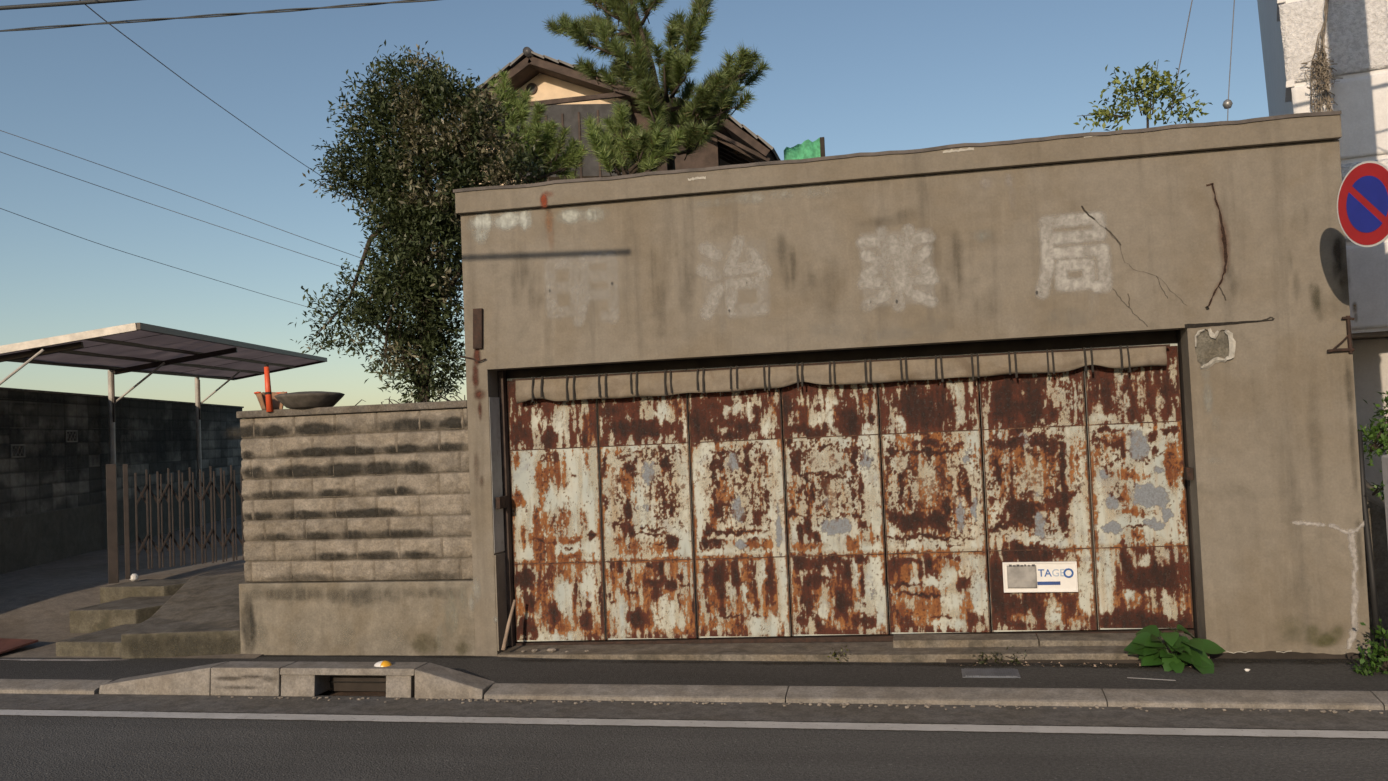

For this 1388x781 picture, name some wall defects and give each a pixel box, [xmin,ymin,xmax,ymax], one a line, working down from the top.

crack [1081,206,1121,245]
crack [1128,183,1275,329]
corrosion [508,346,1182,450]
spalling [1195,328,1236,370]
corrosion [513,546,1194,640]
crack [1292,521,1364,649]